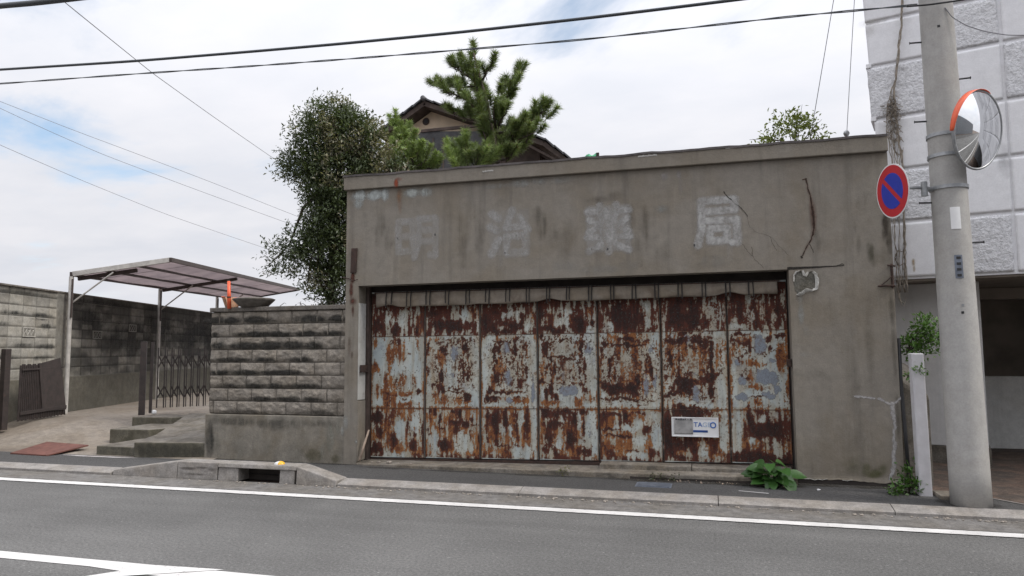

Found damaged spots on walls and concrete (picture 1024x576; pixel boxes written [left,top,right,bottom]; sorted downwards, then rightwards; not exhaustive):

crack [751,178,844,270]
rust [372,281,788,337]
spalling [793,270,819,296]
rust [371,408,793,464]
crack [854,395,901,480]